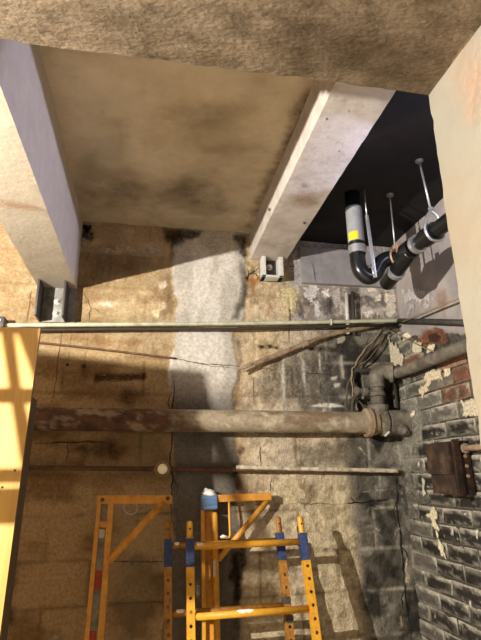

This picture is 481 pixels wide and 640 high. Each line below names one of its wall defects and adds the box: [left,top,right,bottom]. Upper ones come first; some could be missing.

leakage [81,225,93,246]
leakage [165,229,200,245]
leakage [234,236,247,257]
peeling [388,335,403,367]
spalling [403,329,447,353]
peeling [419,368,450,398]
peeling [461,398,478,417]
crack [37,440,106,460]
peeling [426,507,446,559]
crack [298,482,412,640]